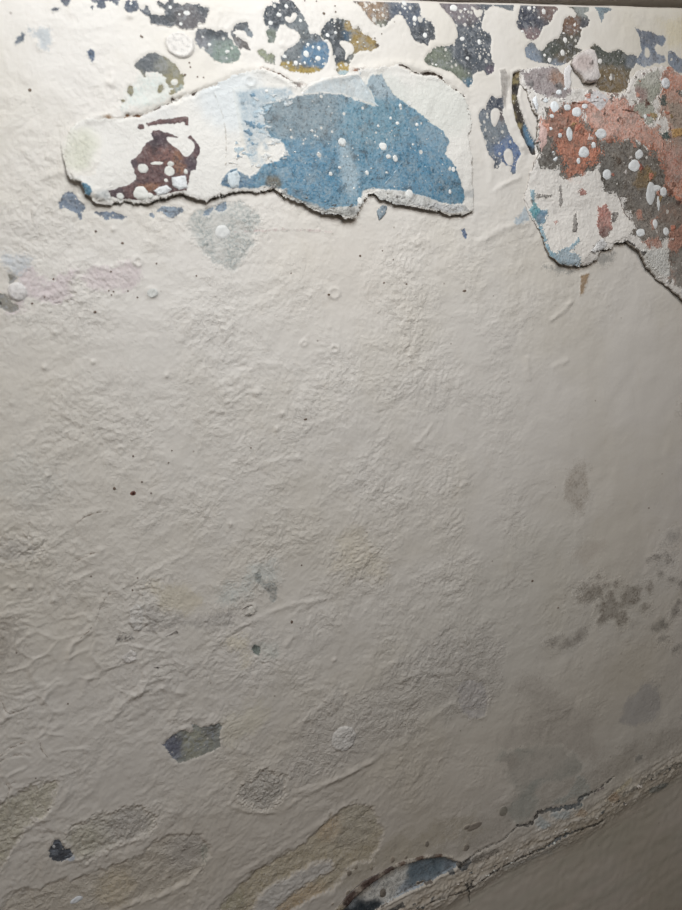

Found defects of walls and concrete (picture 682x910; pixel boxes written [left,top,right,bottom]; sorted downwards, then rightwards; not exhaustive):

peeling [49,0,72,13]
peeling [58,0,682,300]
leakage [253,515,682,910]
peeling [162,723,222,763]
peeling [49,839,73,862]
crack [376,760,682,910]
peeling [336,854,473,910]